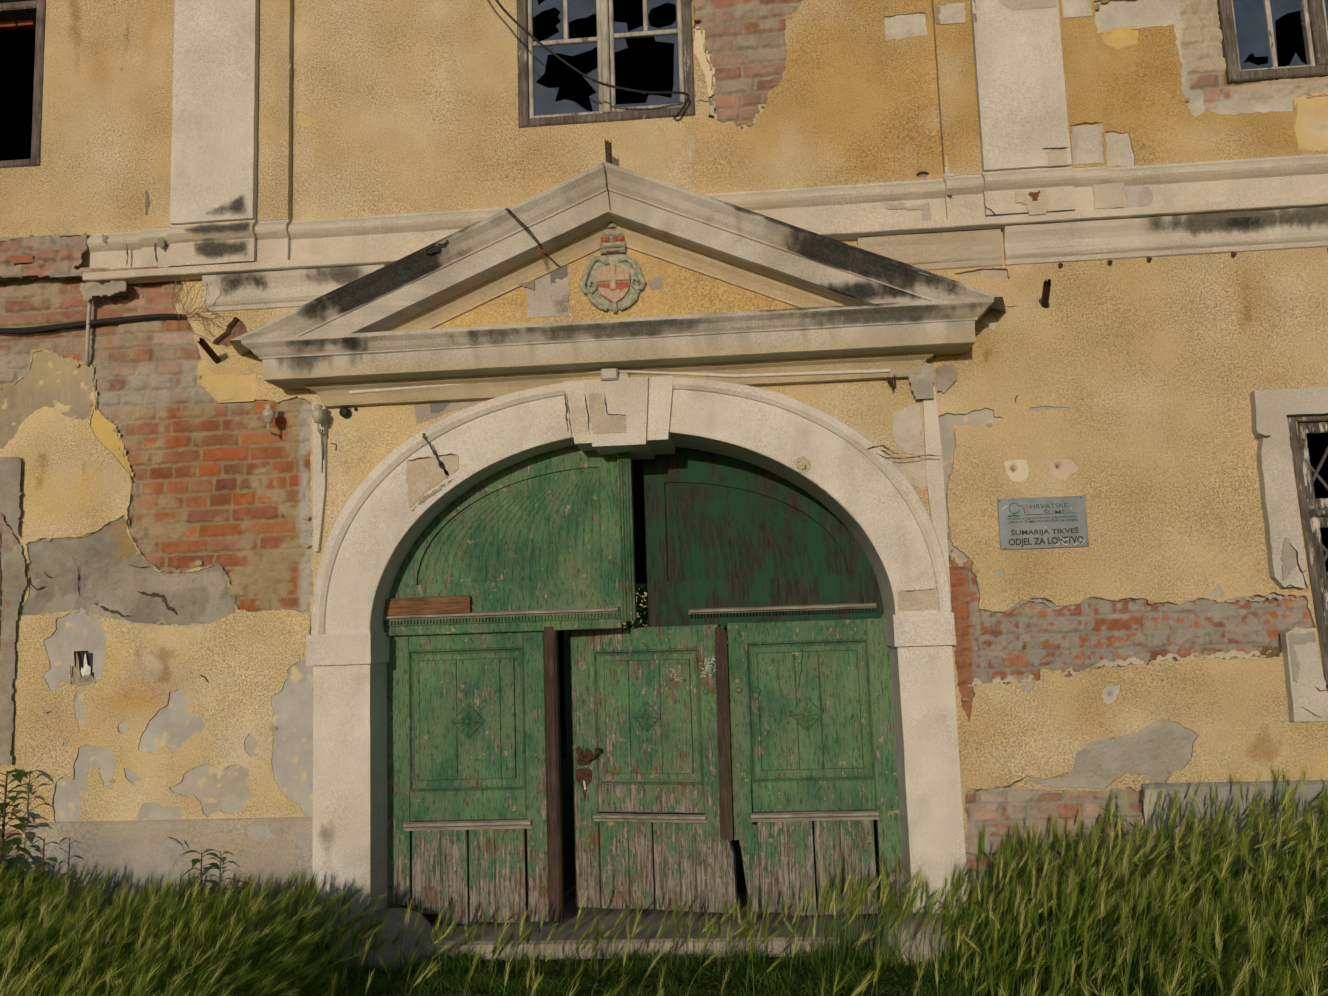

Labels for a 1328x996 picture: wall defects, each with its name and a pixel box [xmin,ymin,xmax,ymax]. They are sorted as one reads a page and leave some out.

flaking render [691,0,806,131]
flaking render [1094,0,1328,151]
leakage [304,226,469,318]
leakage [552,319,692,337]
leakage [732,204,955,322]
leakage [1153,207,1328,233]
flaking render [0,232,313,613]
flaking render [0,514,27,765]
flaking render [938,408,1316,721]
peeling [118,689,205,753]
peeling [135,660,313,820]
flaking render [964,720,1198,888]